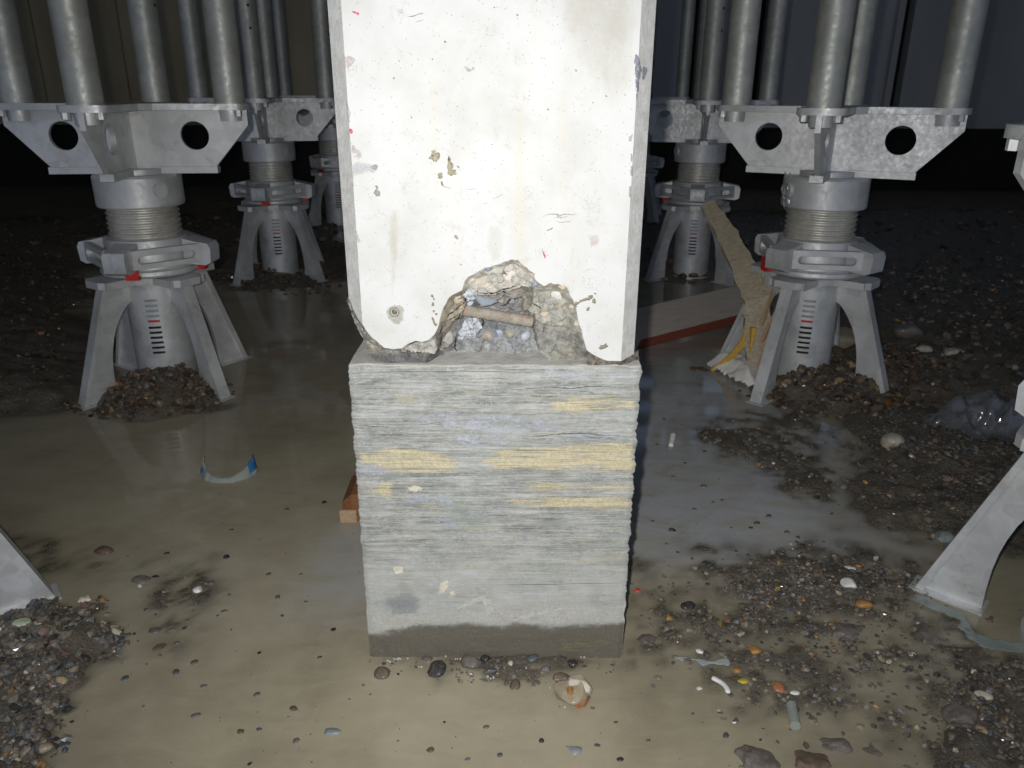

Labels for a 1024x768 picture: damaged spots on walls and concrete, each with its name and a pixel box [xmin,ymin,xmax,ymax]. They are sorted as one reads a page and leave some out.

spalling [347,259,587,363]
water stain [368,579,626,661]